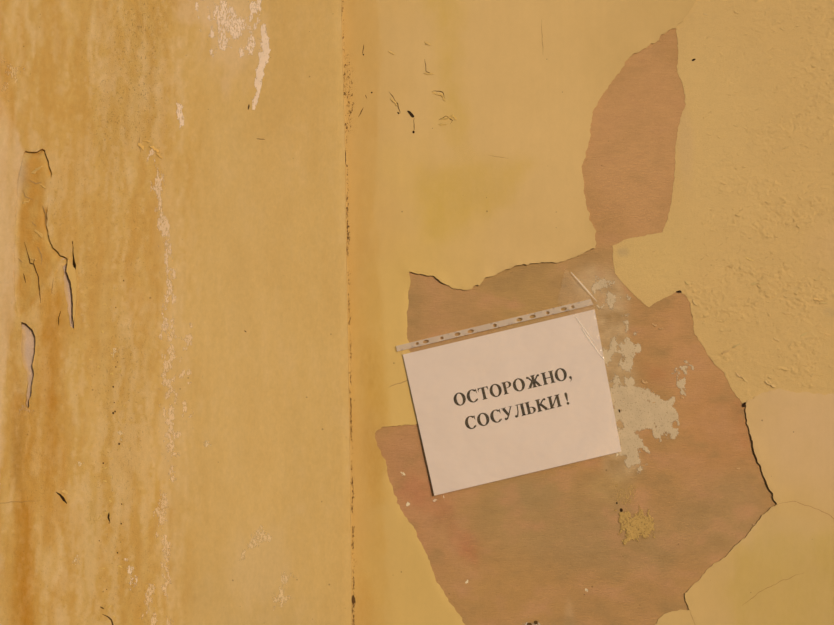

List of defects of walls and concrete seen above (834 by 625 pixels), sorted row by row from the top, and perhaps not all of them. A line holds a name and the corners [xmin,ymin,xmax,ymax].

damp [176,100,184,130]
damp [194,0,271,110]
flaking render [13,150,77,407]
efflorescence [147,148,193,482]
peeling [375,28,777,625]
efflorescence [141,490,174,625]